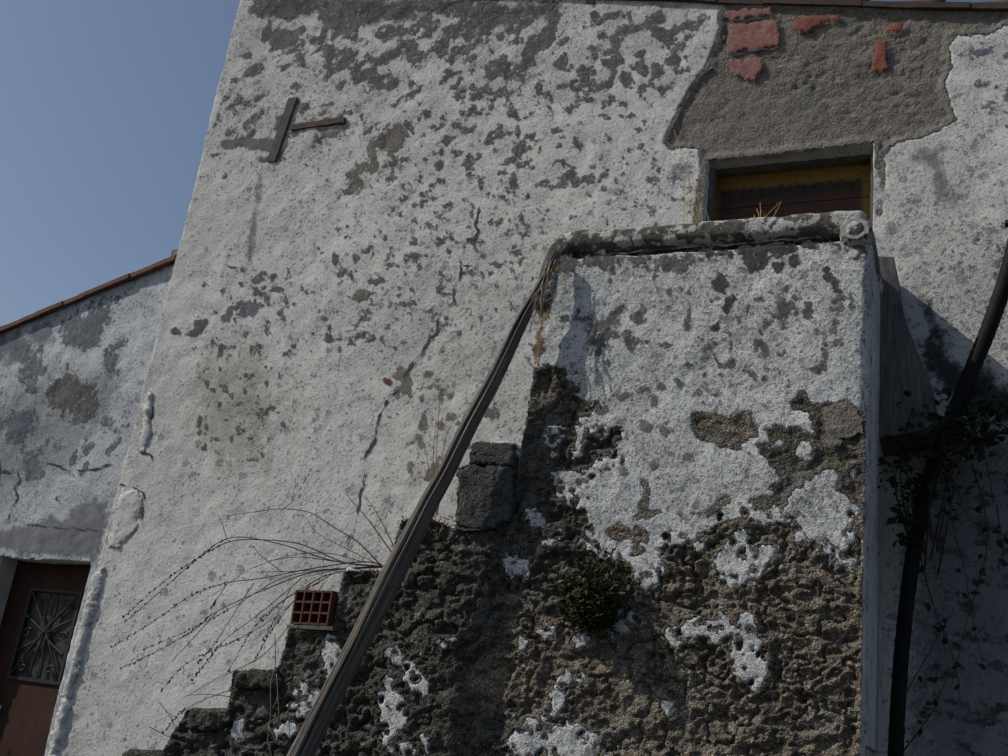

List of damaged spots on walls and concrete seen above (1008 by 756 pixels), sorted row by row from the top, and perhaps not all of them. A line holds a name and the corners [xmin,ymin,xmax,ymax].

spalling [208,0,1008,366]
peeling [170,266,321,474]
crack [343,207,480,556]
crack [0,456,99,531]
crack [48,463,145,522]
spalling [314,239,868,756]
spalling [163,569,381,756]
spalling [908,663,1008,756]